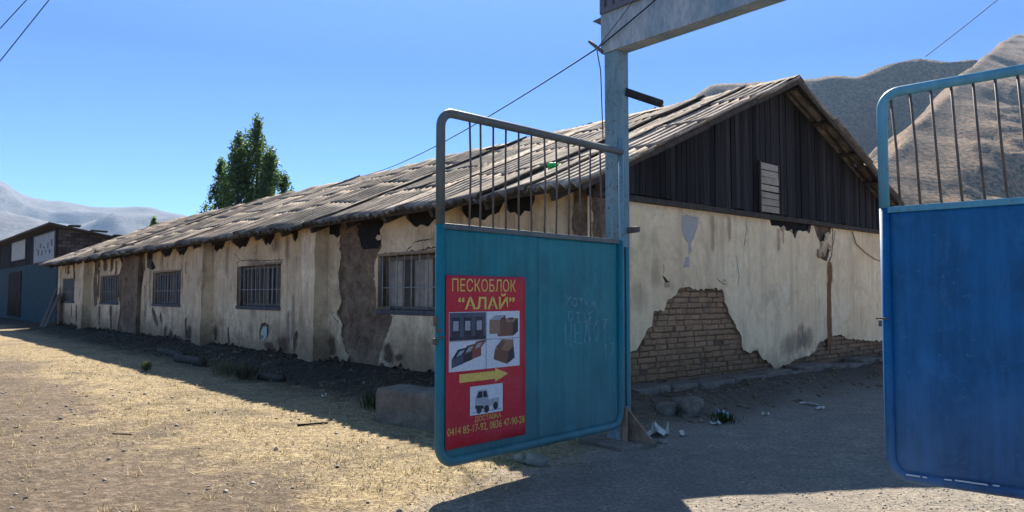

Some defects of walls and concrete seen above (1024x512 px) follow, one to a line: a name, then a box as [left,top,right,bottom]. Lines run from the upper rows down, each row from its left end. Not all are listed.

spalling [214,238,250,252]
spalling [406,211,436,227]
peeling [682,216,698,267]
flaking render [770,220,832,261]
flaking render [93,243,135,332]
flaking render [329,218,393,366]
flaking render [259,322,269,340]
flaking render [630,264,883,385]